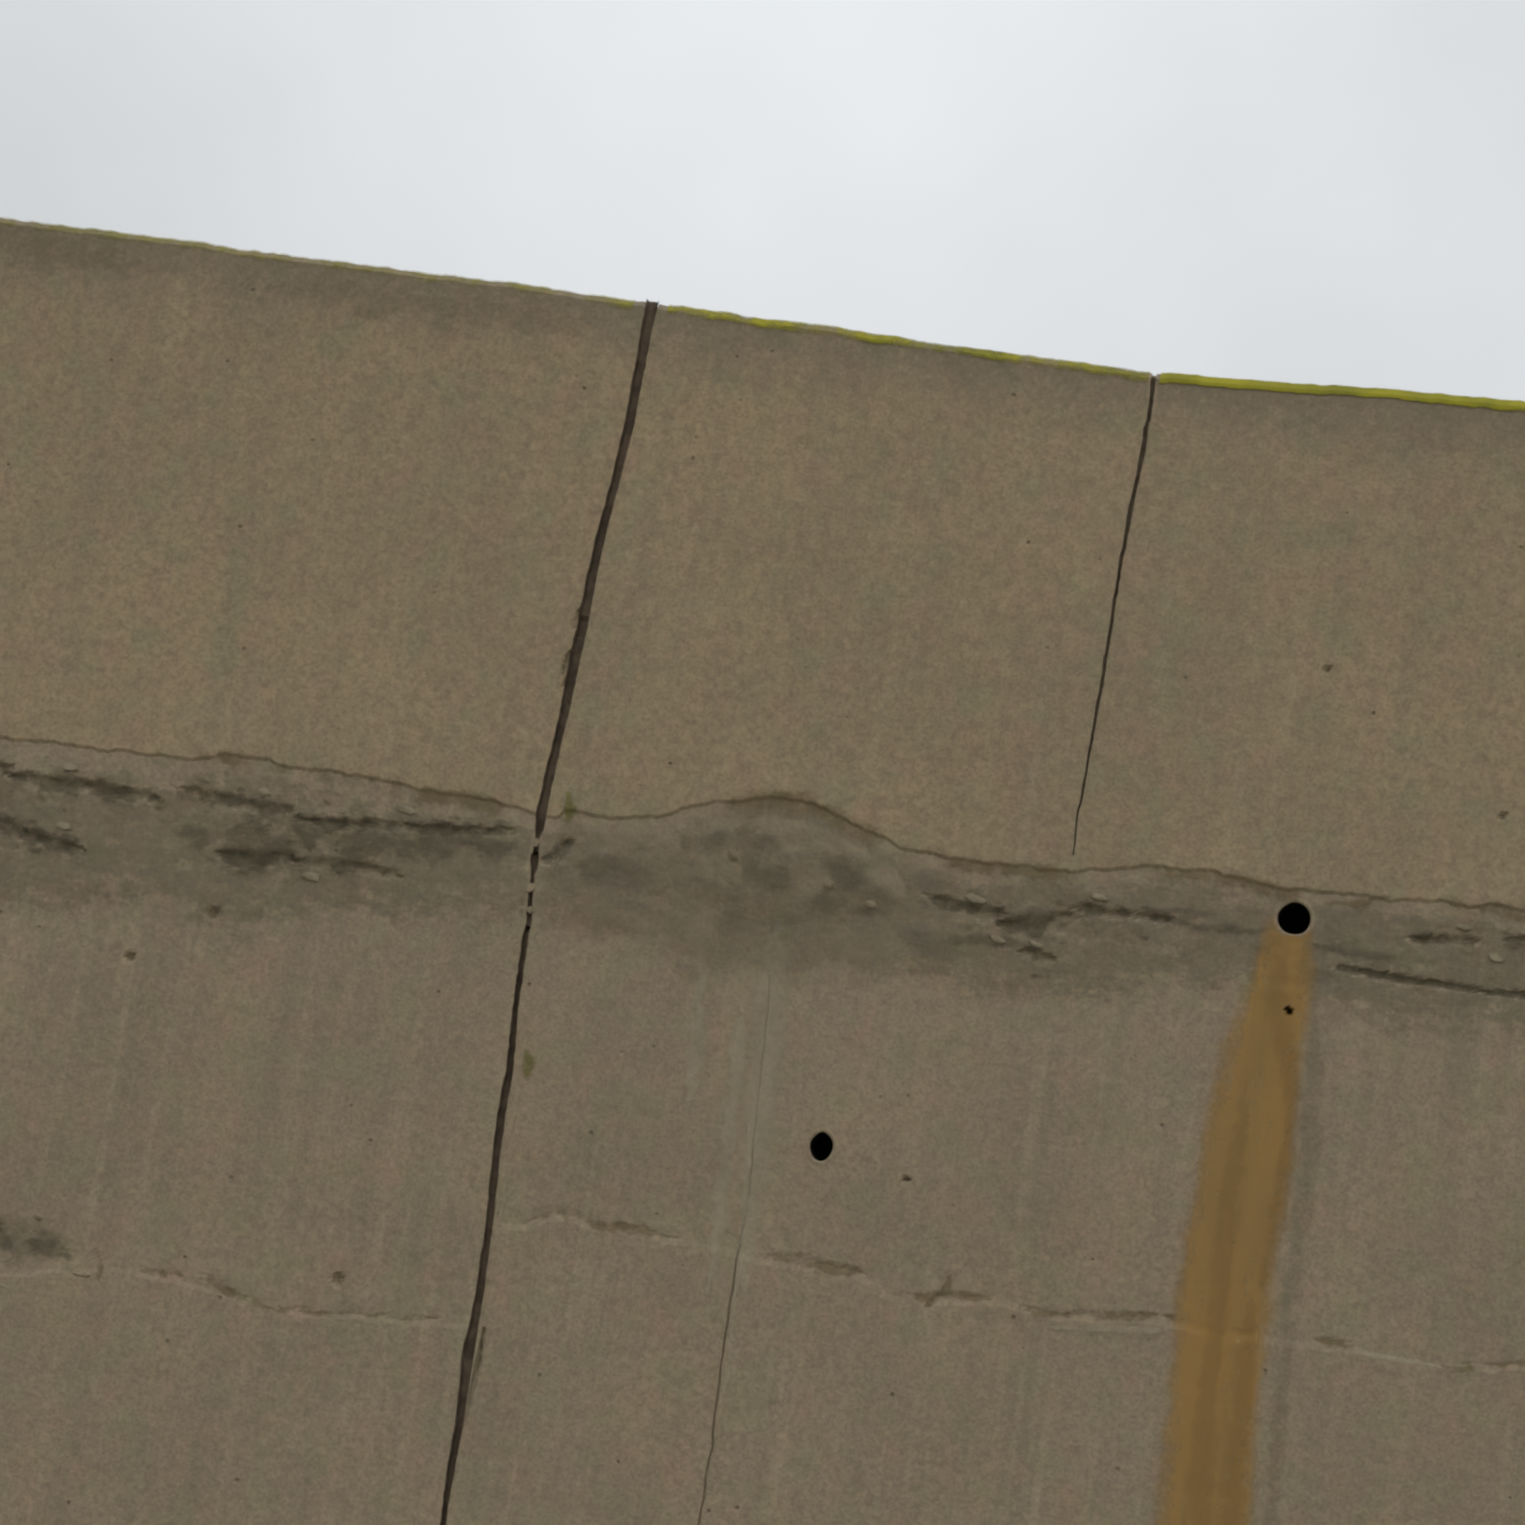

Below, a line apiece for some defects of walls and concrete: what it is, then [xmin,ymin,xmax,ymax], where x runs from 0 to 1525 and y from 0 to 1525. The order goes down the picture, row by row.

crack [440,299,659,1525]
crack [1073,378,1156,855]
corrosion [1162,928,1309,1525]